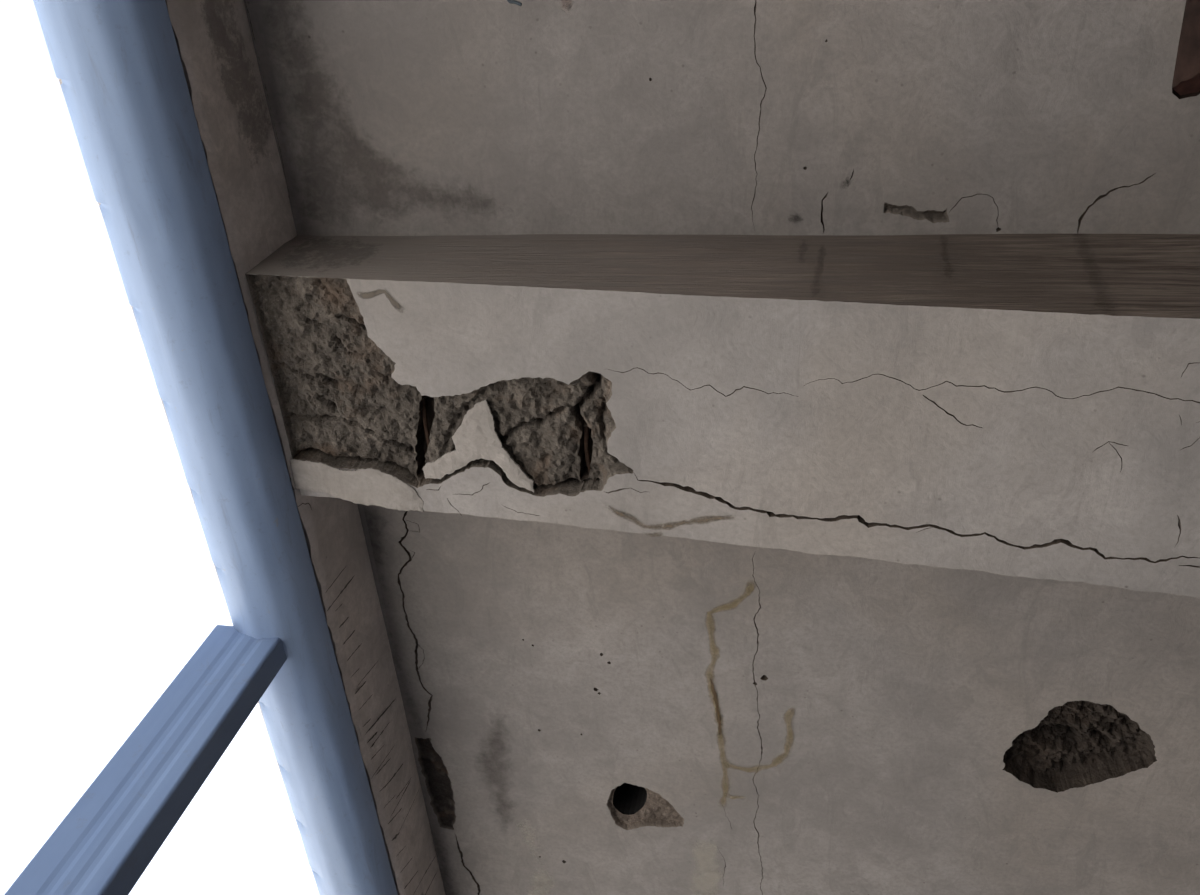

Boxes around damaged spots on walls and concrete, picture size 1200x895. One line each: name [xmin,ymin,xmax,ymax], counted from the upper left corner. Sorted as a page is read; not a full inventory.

crack [751,0,767,231]
spalling [883,202,949,223]
crack [948,194,999,224]
crack [1077,174,1154,232]
spalling [245,274,634,497]
crack [609,363,1200,450]
crack [603,475,1200,568]
crack [398,483,539,732]
crack [716,558,763,895]
leakage [707,584,792,803]
peeling [415,737,456,830]
crack [455,835,481,895]